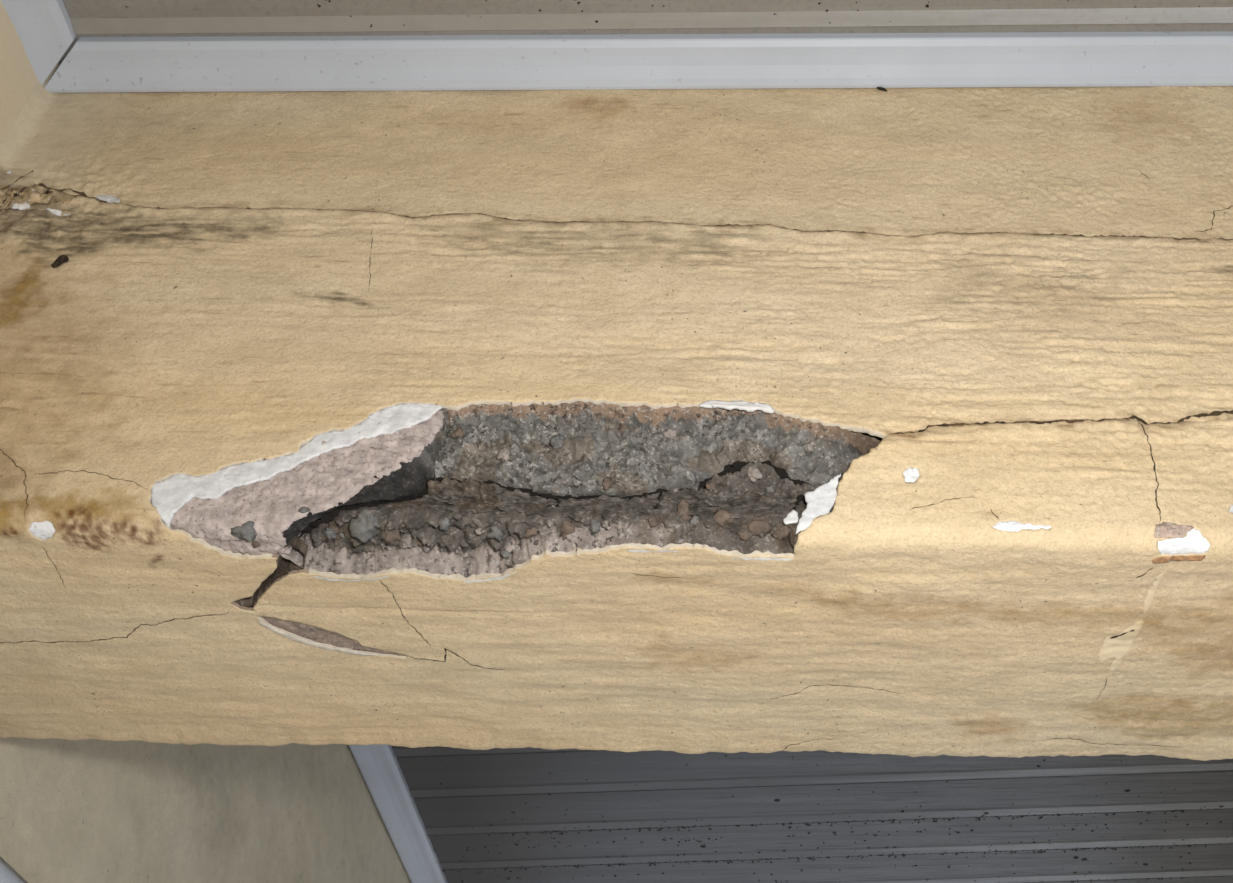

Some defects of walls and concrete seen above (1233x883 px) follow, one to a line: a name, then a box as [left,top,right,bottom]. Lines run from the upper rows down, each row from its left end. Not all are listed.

spalling [0,170,120,216]
spalling [51,255,69,268]
damp [4,203,245,256]
crack [351,210,524,290]
crack [1037,206,1233,240]
crack [0,449,148,518]
spalling [151,400,881,583]
crack [892,410,1233,524]
peeling [1152,522,1210,564]
crack [1,536,503,670]